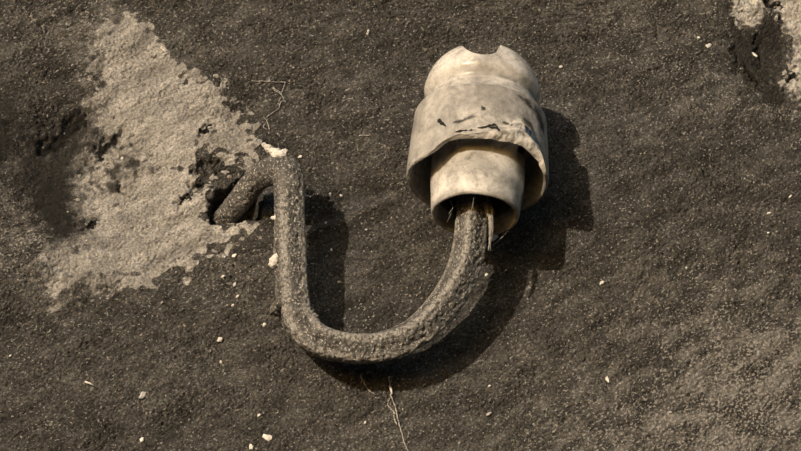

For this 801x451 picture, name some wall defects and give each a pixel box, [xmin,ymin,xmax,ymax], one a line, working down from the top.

spalling [29,8,262,313]
spalling [731,0,801,107]